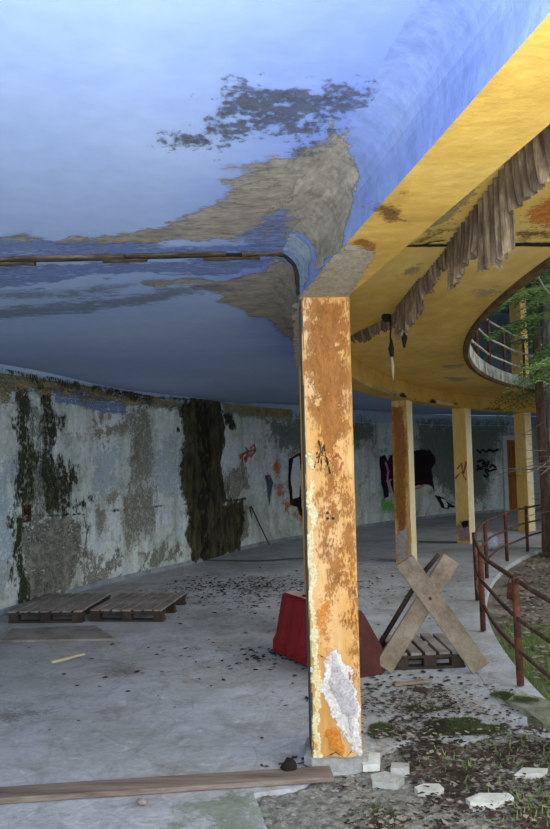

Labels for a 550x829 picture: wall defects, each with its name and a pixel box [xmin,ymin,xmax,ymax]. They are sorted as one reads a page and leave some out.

peeling [0,209,376,368]
corrosion [516,198,550,238]
water stain [0,369,183,604]
corrosion [301,297,360,686]
peeling [305,451,362,758]
spalling [257,733,550,829]